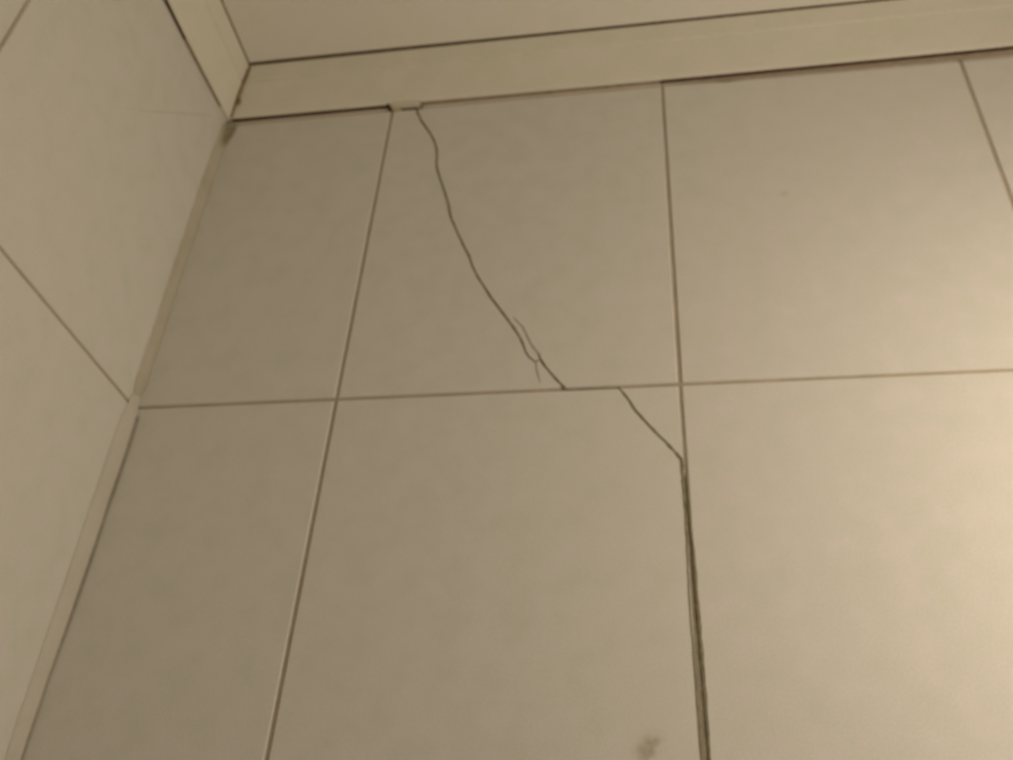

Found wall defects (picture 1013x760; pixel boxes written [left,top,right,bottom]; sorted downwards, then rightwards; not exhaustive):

crack [387,100,711,760]